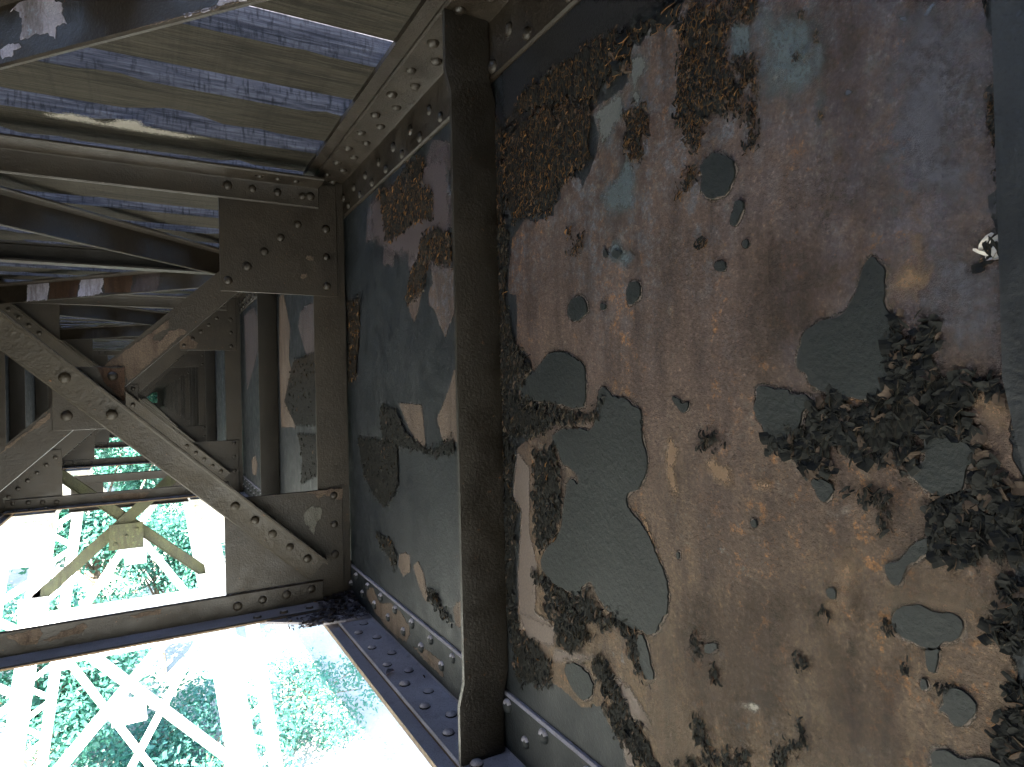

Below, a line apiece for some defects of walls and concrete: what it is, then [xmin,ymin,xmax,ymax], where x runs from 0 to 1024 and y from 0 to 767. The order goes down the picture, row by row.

peeling [0,0,67,59]
corrosion [370,149,450,273]
peeling [366,138,454,337]
peeling [279,294,343,534]
peeling [357,369,457,508]
corrosion [665,438,679,497]
corrosion [705,458,734,488]
peeling [494,0,1024,767]
peeling [376,530,461,628]